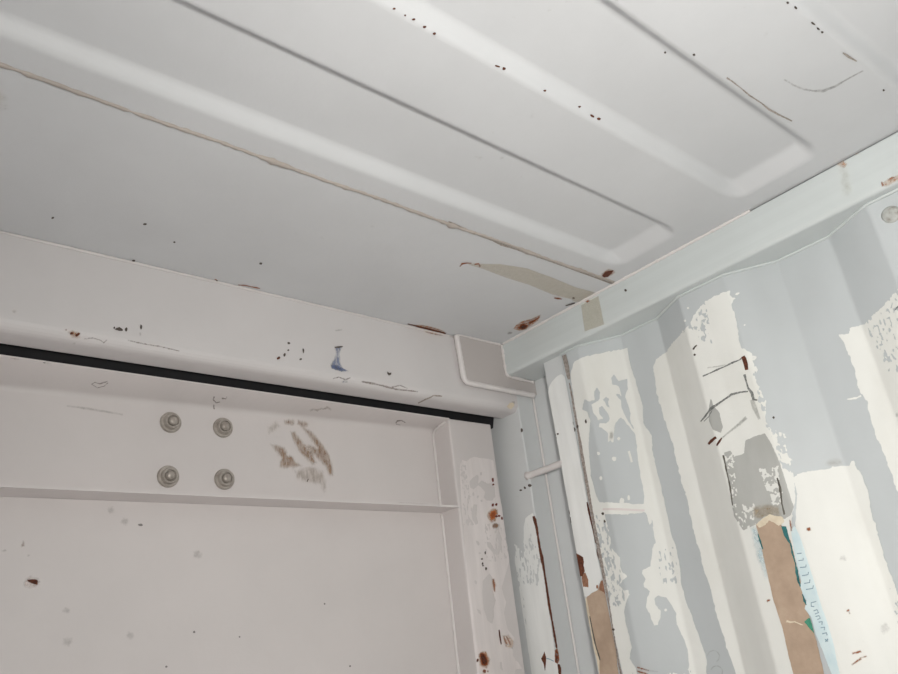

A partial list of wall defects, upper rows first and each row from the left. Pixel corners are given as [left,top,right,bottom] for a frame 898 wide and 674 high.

water stain [294,434,332,474]
corrosion [477,652,489,673]
corrosion [488,503,503,528]
peeling [460,457,559,674]
peeling [548,348,707,674]
peeling [653,289,898,674]